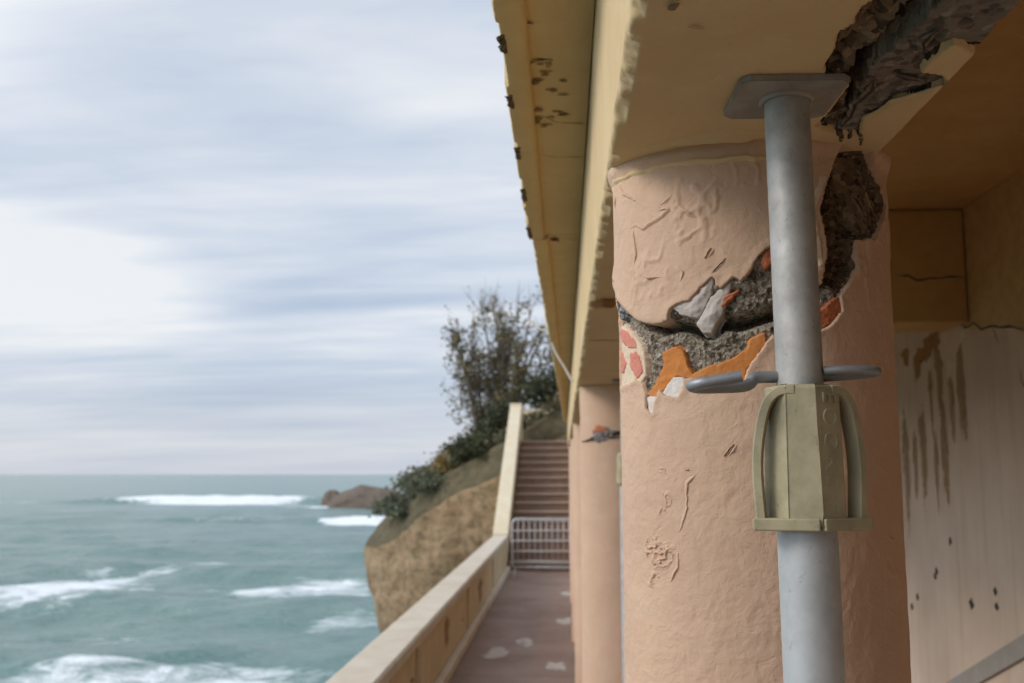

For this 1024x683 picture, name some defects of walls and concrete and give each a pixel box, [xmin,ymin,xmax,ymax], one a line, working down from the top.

spalling [814,0,1019,330]
spalling [616,247,774,414]
water stain [902,344,967,522]